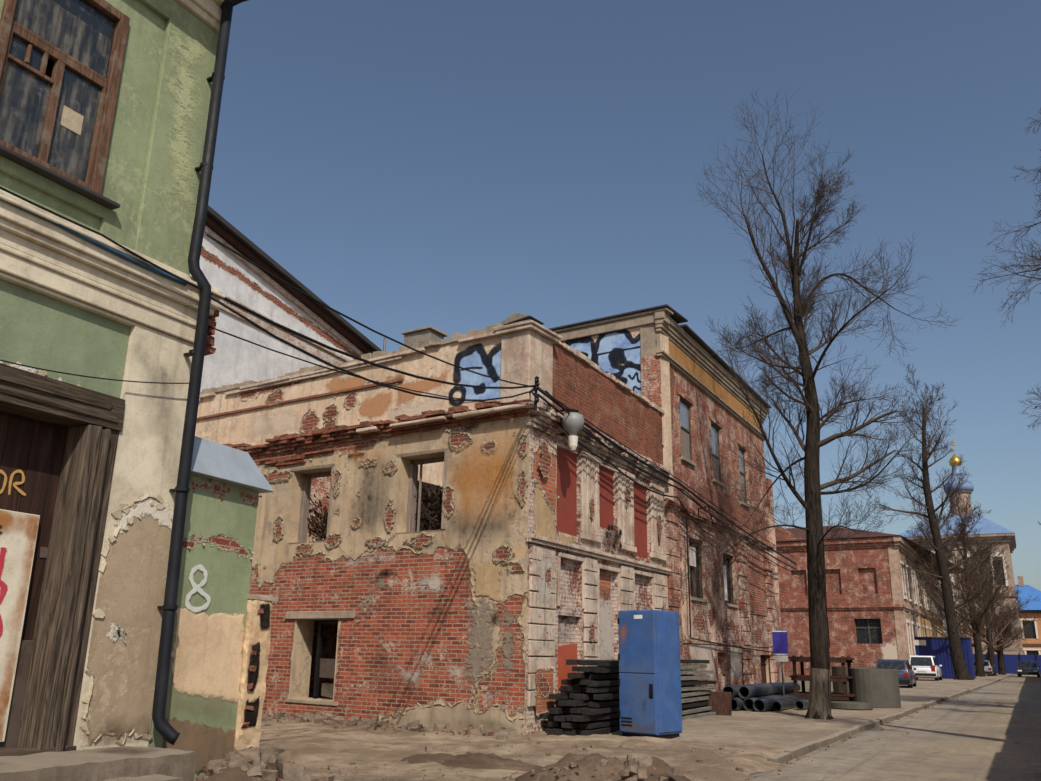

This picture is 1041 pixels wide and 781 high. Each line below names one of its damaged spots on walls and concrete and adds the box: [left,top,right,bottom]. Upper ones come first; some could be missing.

flaking render [251,436,391,483]
flaking render [190,476,262,505]
spalling [442,484,455,518]
flaking render [600,572,611,600]
flaking render [80,492,555,747]